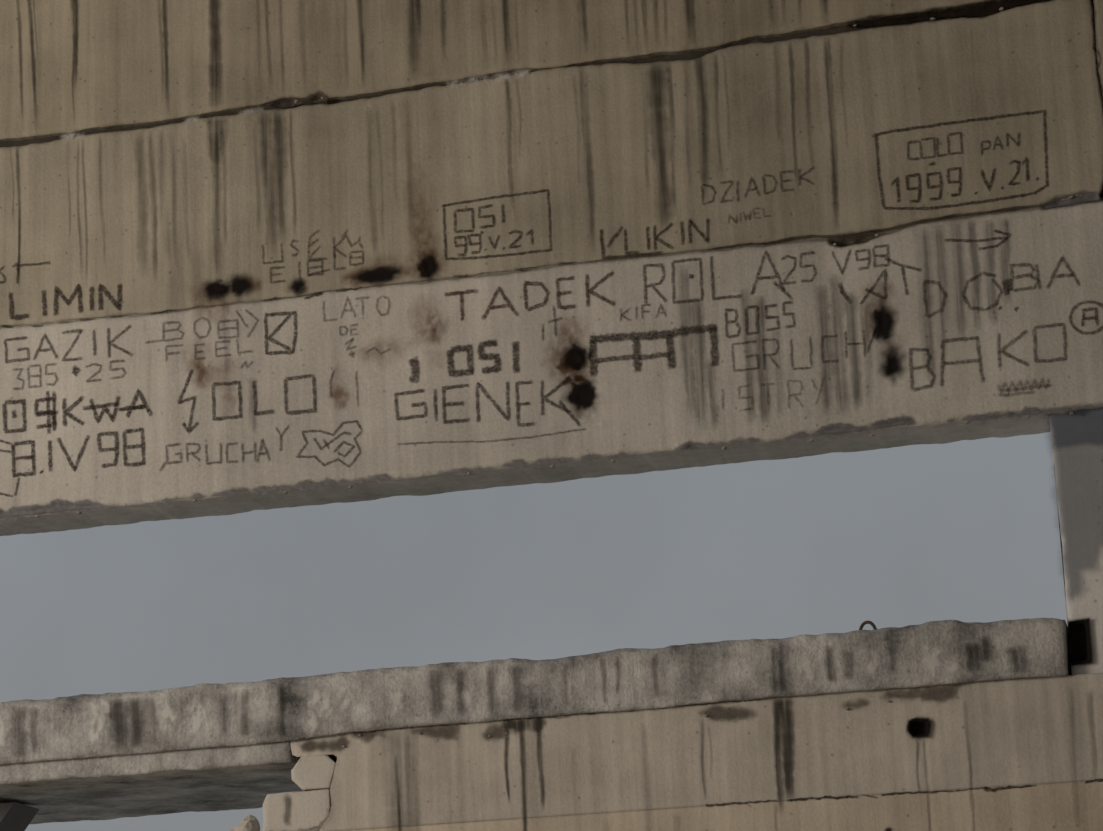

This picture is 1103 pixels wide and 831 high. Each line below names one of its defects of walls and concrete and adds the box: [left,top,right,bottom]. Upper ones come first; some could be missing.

water stain [210,0,219,83]
crack [1091,0,1103,100]
water stain [651,69,667,210]
corrosion [206,277,252,299]
corrosion [358,267,400,283]
corrosion [422,257,437,277]
corrosion [563,332,586,368]
corrosion [873,306,901,376]
corrosion [567,384,595,409]
water stain [111,701,139,743]
water stain [774,659,793,800]
water stain [504,719,544,831]